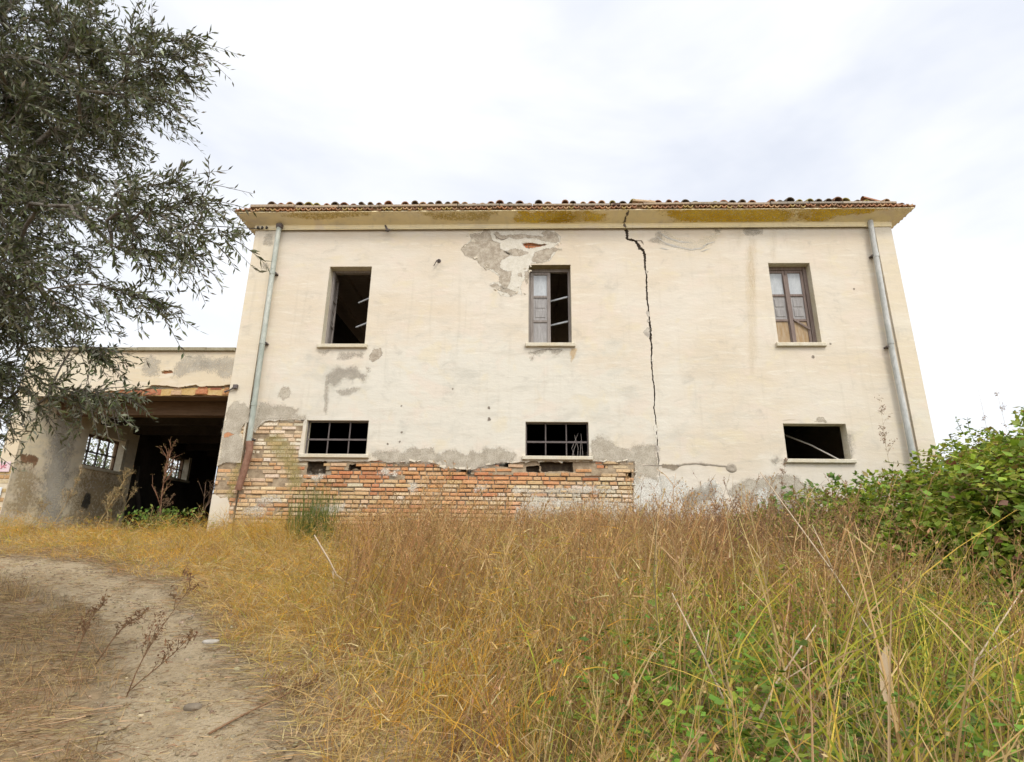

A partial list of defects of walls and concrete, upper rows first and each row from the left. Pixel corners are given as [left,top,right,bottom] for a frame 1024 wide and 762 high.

peeling [461,229,562,297]
peeling [143,355,234,378]
peeling [369,348,383,362]
crack [622,210,663,492]
flaking render [214,401,727,535]